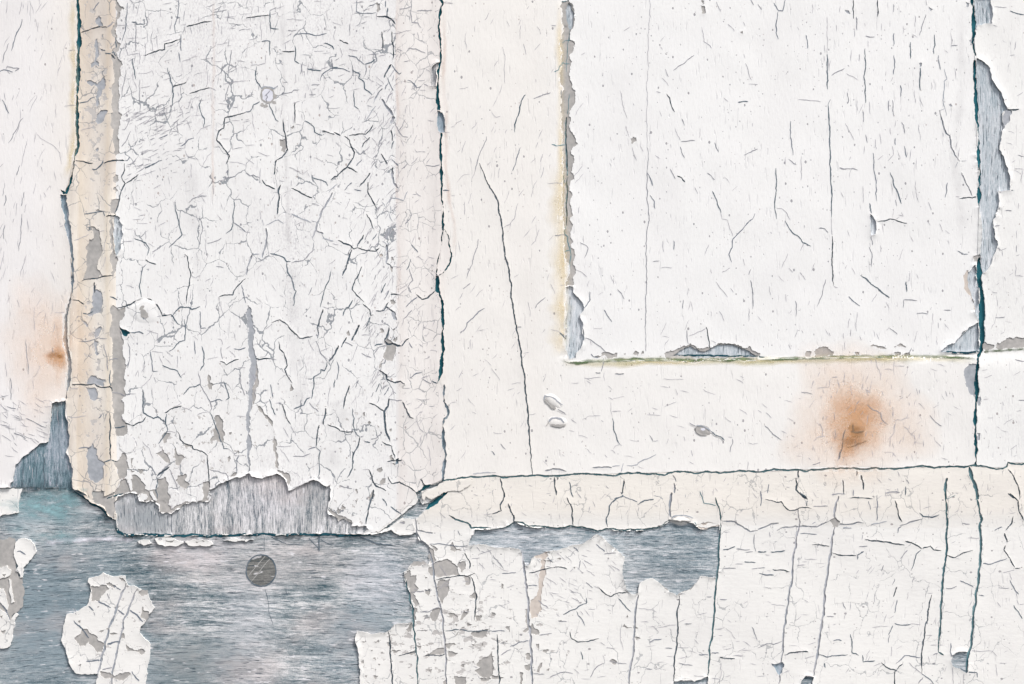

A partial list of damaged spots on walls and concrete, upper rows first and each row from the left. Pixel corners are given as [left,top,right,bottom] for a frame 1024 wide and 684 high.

crack [0,93,62,279]
spalling [87,0,124,156]
spalling [83,174,131,436]
crack [70,0,438,498]
peeling [0,299,720,684]
crack [458,90,562,486]
crack [442,411,686,535]
peeling [560,1,584,359]
crack [363,467,1024,684]
peeling [664,343,760,363]
crack [610,0,976,351]
peeling [941,59,1024,406]